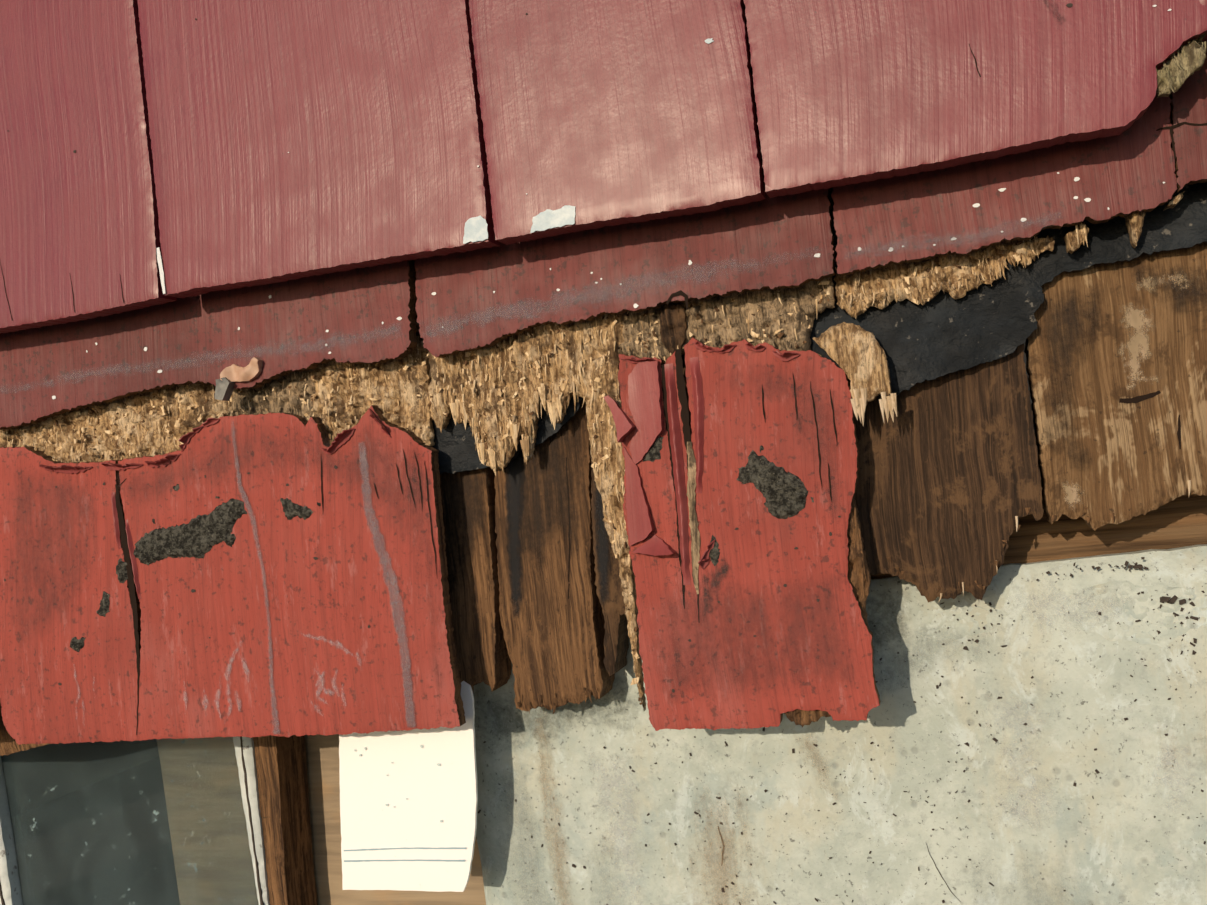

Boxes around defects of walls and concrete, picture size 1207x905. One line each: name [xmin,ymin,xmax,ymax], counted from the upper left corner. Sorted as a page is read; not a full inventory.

peeling [214,357,263,401]
peeling [1120,307,1157,389]
peeling [39,418,219,474]
peeling [320,428,355,454]
crack [662,349,700,623]
peeling [604,341,800,585]
peeling [1063,485,1080,504]
crack [111,478,141,735]